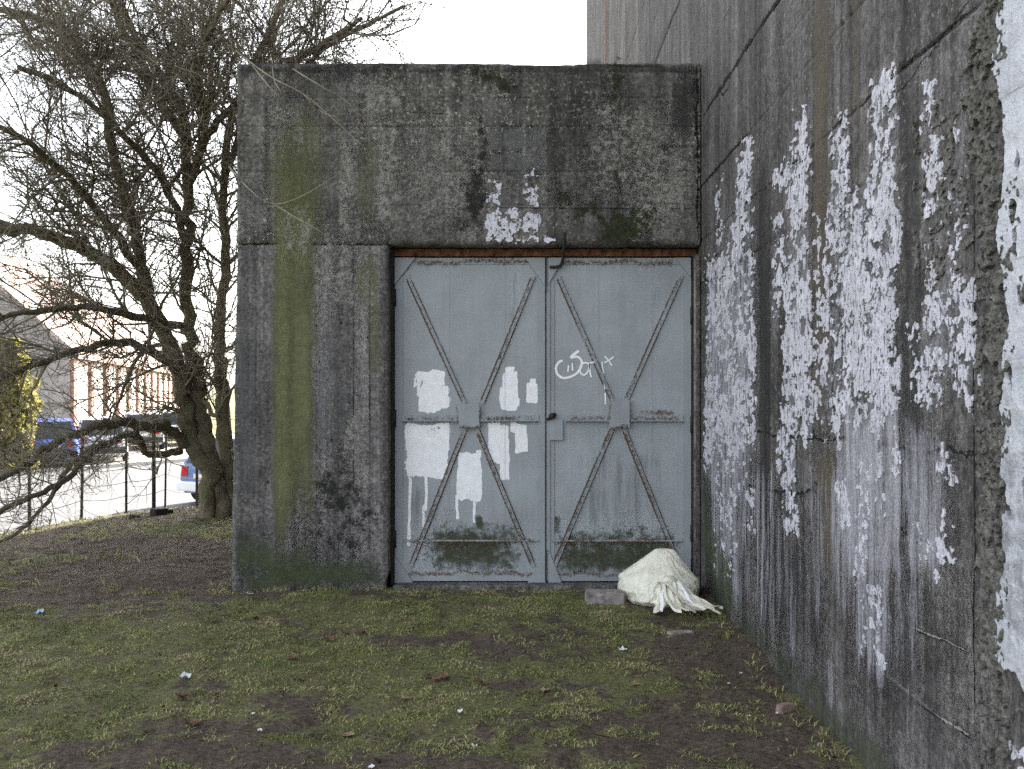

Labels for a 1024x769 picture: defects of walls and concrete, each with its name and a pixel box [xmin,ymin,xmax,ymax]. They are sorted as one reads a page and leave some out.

leakage [272,132,384,557]
rust [407,278,534,577]
peeling [484,168,556,244]
rust [557,279,612,398]
rust [554,409,679,577]
leakage [588,64,695,233]
rust [626,278,682,397]
crack [473,0,981,282]
peeling [702,135,757,582]
leakage [708,183,818,630]
leakage [818,233,937,705]
peeling [771,0,1024,769]